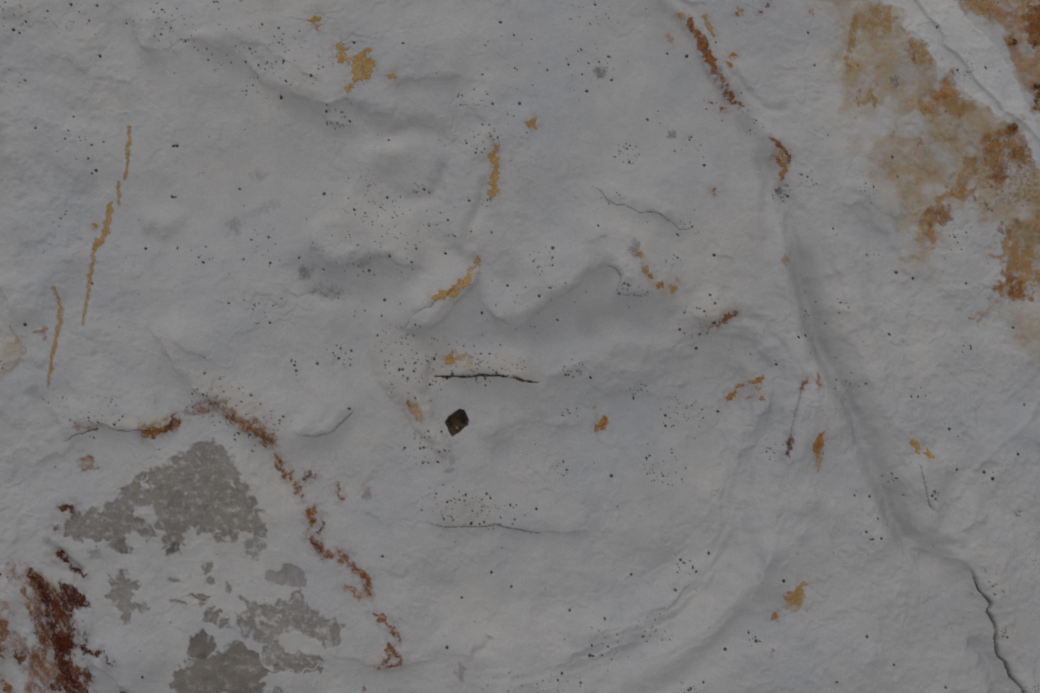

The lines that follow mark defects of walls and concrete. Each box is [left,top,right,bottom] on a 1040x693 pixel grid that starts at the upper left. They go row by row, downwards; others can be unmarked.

rust [678,13,744,110]
rust [770,138,791,181]
crack [445,374,531,382]
rust [142,414,181,439]
rust [226,410,316,497]
peeling [65,443,264,553]
rust [305,506,371,598]
rust [0,550,110,693]
peeling [171,610,268,693]
rust [373,613,402,670]